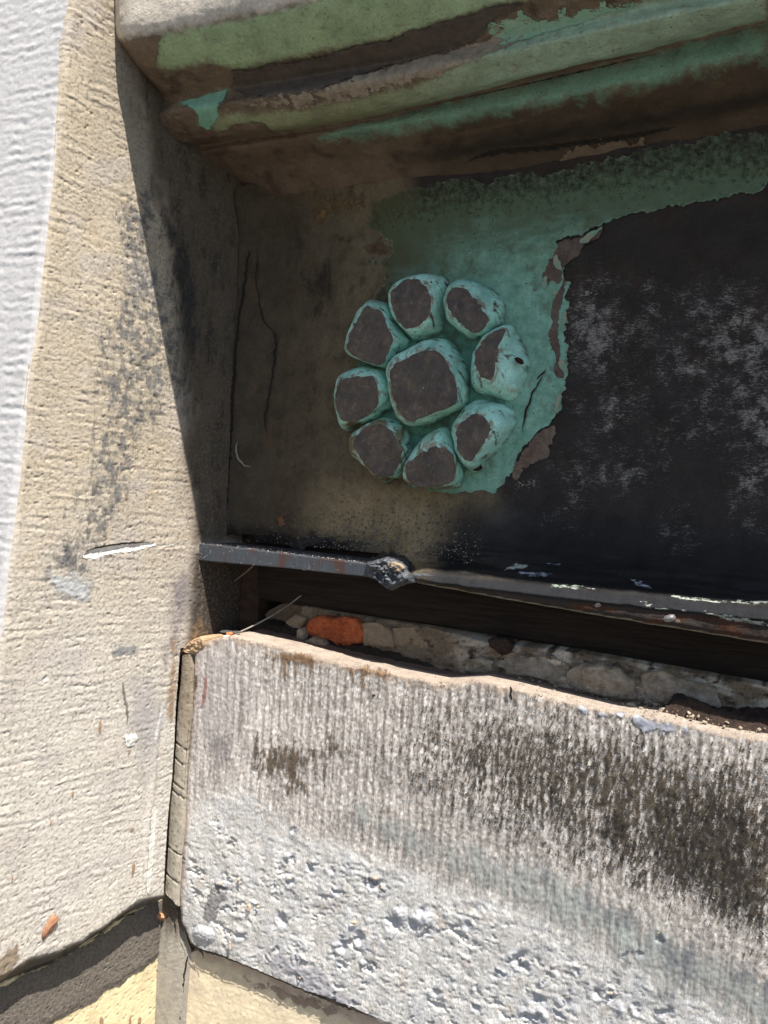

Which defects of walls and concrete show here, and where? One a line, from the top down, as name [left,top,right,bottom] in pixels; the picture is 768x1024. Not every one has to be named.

peeling [182,89,227,130]
peeling [542,227,603,378]
crack [225,250,277,535]
water stain [210,707,244,789]
water stain [251,672,768,986]